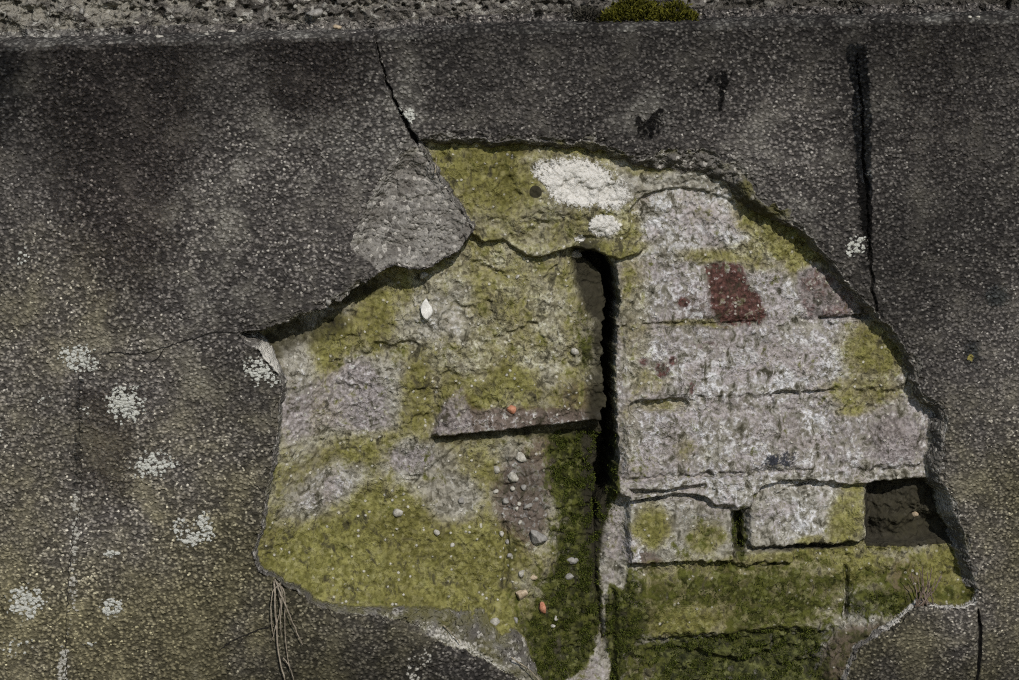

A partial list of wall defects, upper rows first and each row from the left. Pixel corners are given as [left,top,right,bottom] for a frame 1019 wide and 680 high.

crack [375,35,419,143]
crack [855,53,879,312]
spalling [240,130,979,680]
crack [975,609,983,680]